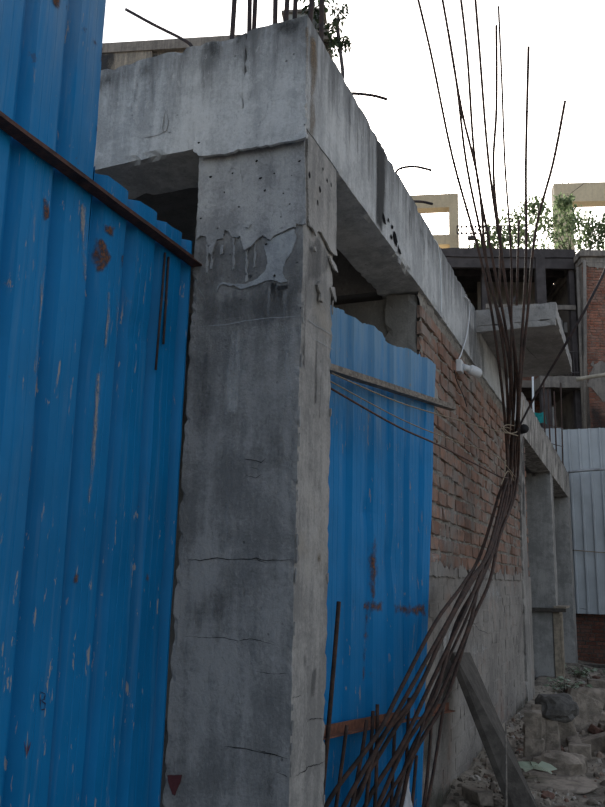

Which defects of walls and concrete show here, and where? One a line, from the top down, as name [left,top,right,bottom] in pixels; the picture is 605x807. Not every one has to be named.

water stain [101,53,113,70]
peeling [196,124,338,303]
rust [93,226,113,271]
flaking render [323,0,566,807]
crack [188,556,295,564]
rust [364,556,381,610]
crack [225,746,323,777]